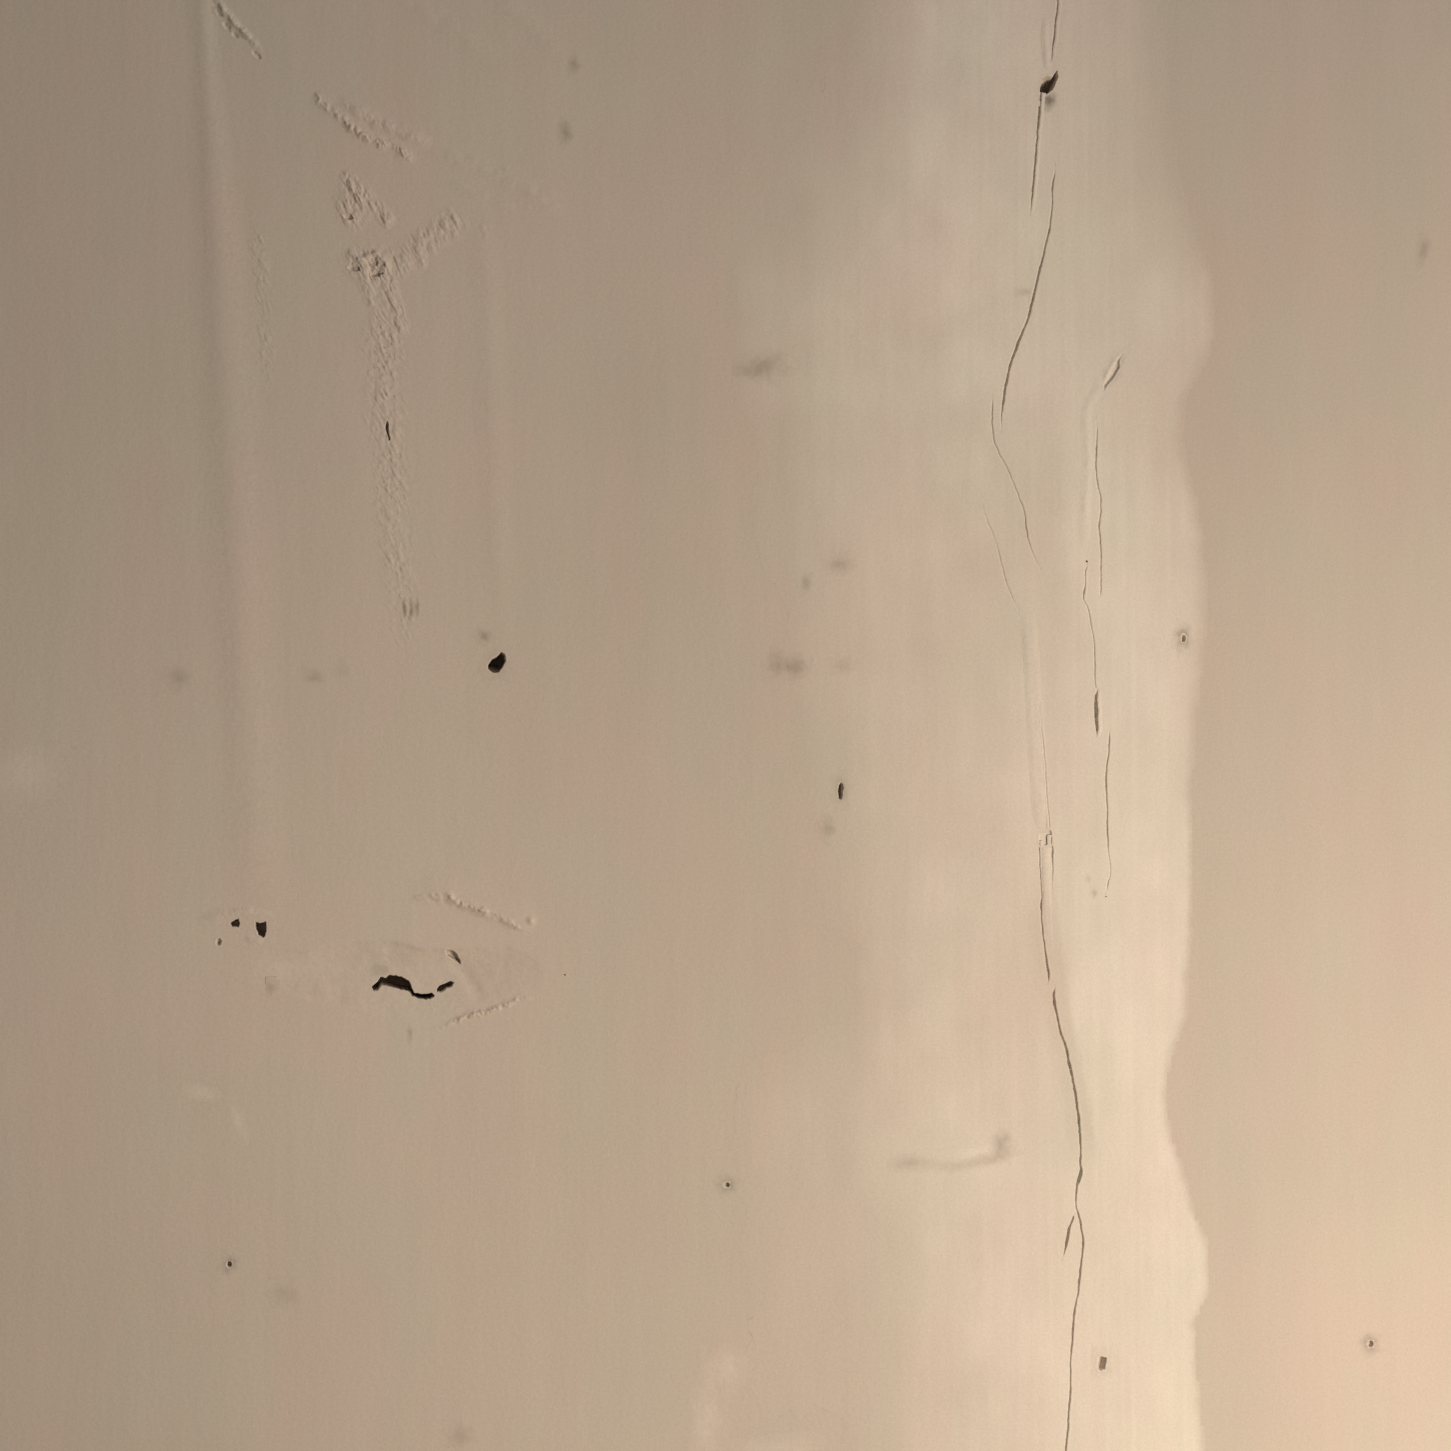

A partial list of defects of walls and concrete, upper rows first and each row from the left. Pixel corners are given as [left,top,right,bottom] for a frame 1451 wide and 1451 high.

crack [982,0,1086,1451]
crack [1078,350,1126,896]